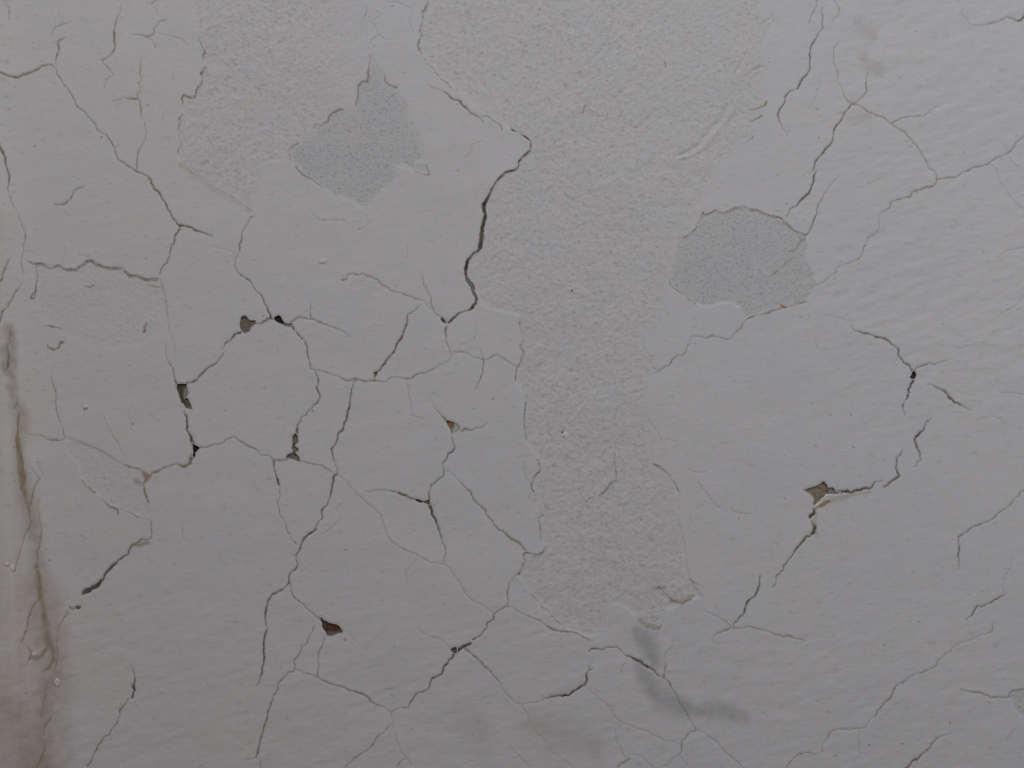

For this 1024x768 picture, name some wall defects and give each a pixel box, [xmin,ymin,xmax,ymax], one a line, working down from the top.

peeling [177,0,429,213]
crack [440,129,531,324]
peeling [418,0,815,636]
spalling [177,384,192,409]
crack [302,402,350,541]
flaking render [804,481,837,508]
crack [837,429,924,493]
crack [795,510,816,551]
crack [76,546,132,609]
peeling [321,617,343,636]
crack [410,617,494,703]
crack [550,675,588,697]